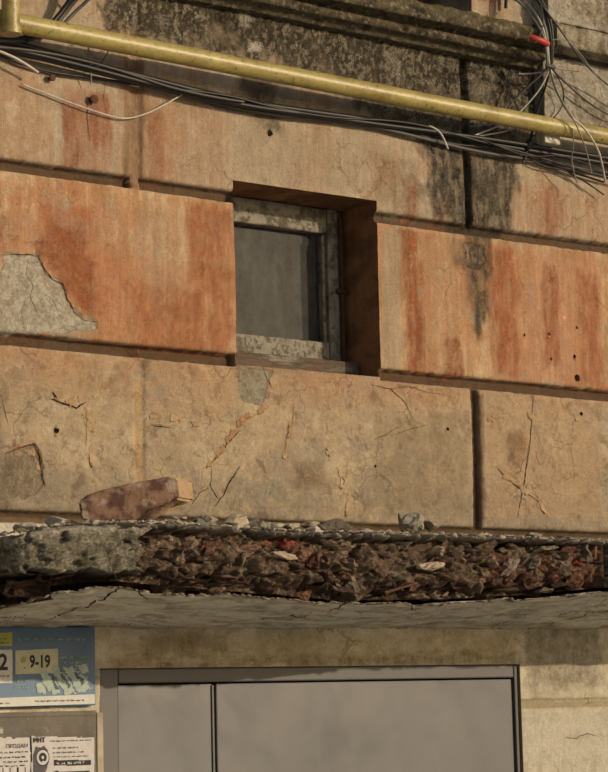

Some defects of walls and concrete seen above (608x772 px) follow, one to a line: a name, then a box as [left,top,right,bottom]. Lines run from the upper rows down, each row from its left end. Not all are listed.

damp [98,0,535,114]
damp [352,98,539,335]
peeling [0,252,98,337]
rust [404,231,422,372]
flaking render [0,440,45,499]
peeling [51,386,96,467]
crack [192,467,240,505]
peeling [203,365,295,469]
crack [373,385,443,440]
crack [518,395,534,515]
spalling [79,477,608,603]
crack [47,578,155,621]